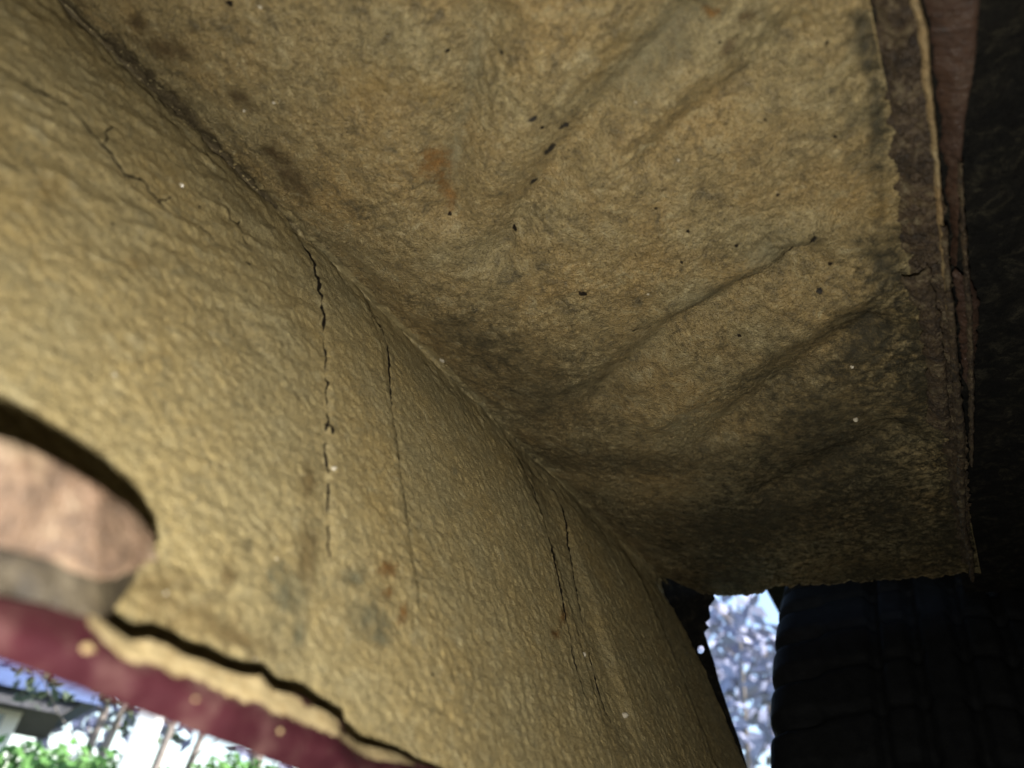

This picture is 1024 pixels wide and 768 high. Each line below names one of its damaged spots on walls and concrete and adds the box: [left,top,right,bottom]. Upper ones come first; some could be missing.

crack [301,242,334,558]
crack [367,302,421,609]
crack [525,474,611,722]